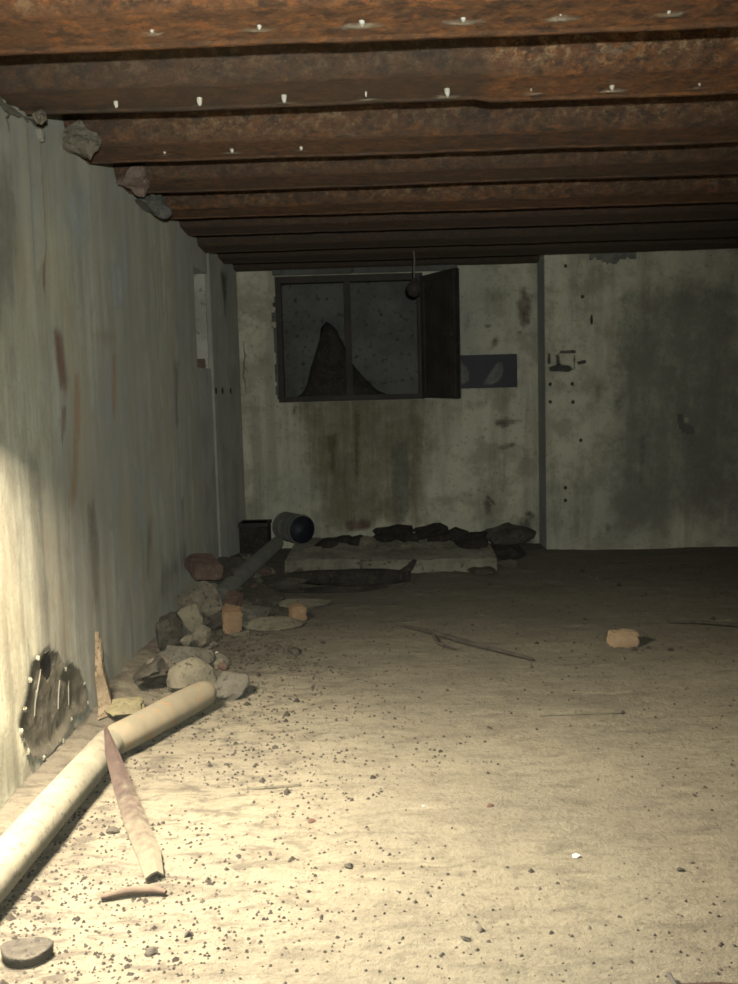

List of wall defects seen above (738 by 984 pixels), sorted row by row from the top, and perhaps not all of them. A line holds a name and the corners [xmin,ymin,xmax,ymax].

peeling [19,650,89,760]